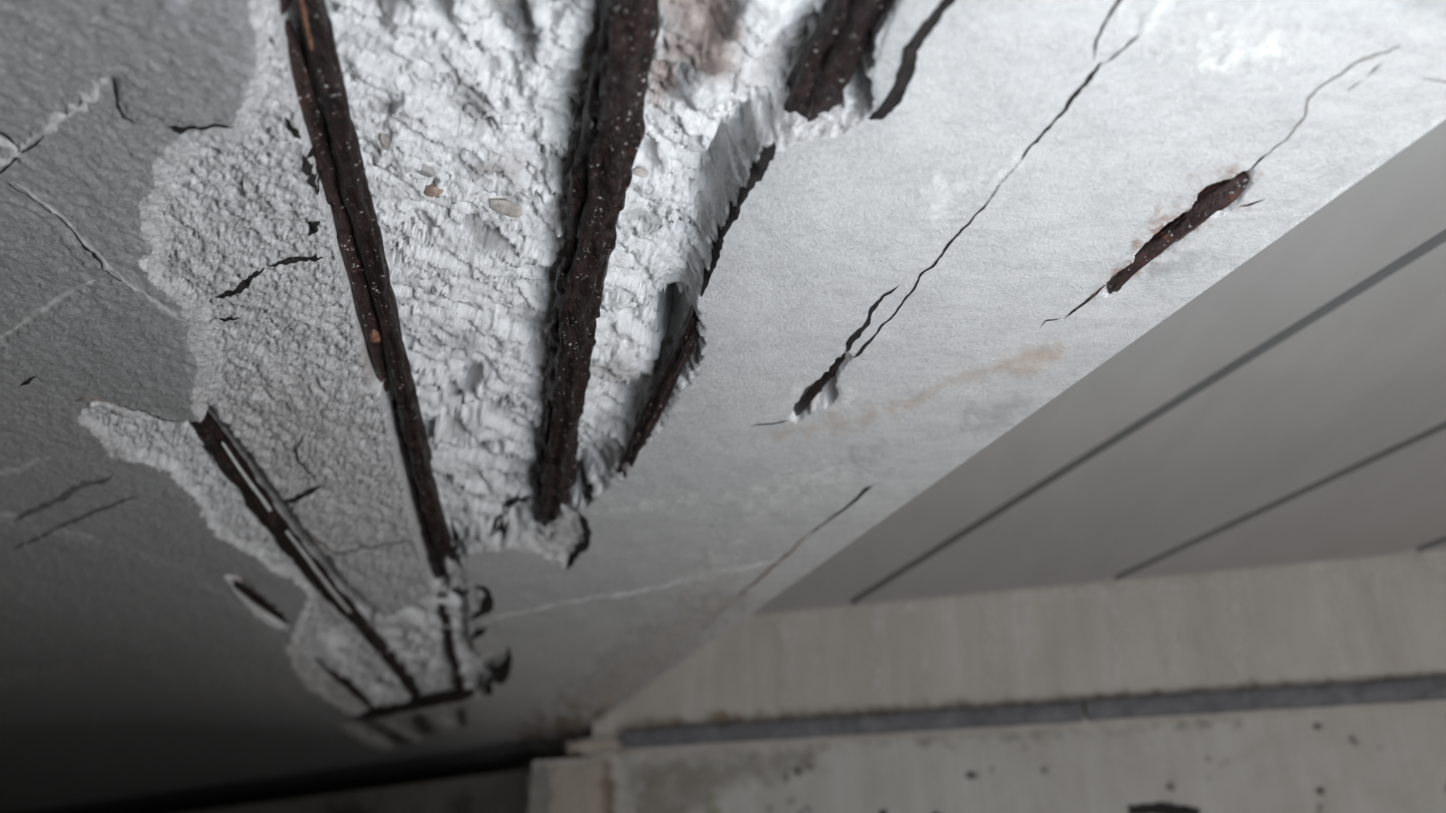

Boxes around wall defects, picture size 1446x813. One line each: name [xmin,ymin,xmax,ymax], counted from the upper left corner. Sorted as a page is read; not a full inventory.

corrosion [297,0,313,51]
crack [0,179,323,323]
crack [112,76,234,134]
crack [846,0,1143,358]
corrosion [1101,168,1255,297]
crack [1239,46,1401,207]
spalling [75,0,943,747]